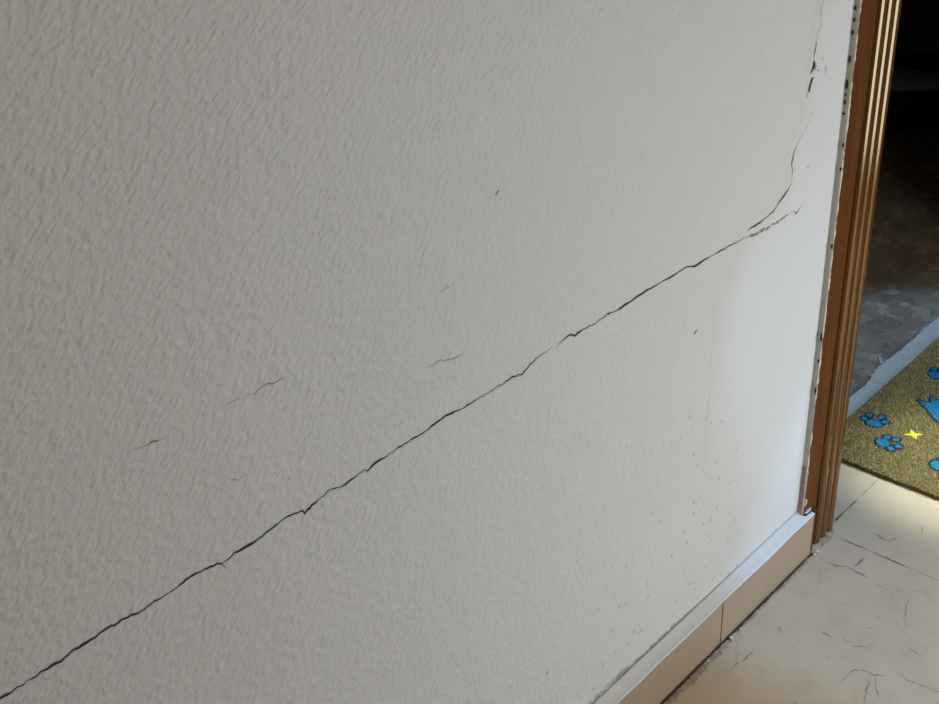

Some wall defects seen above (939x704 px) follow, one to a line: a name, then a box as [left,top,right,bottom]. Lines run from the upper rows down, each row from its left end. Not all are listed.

crack [0,139,800,702]